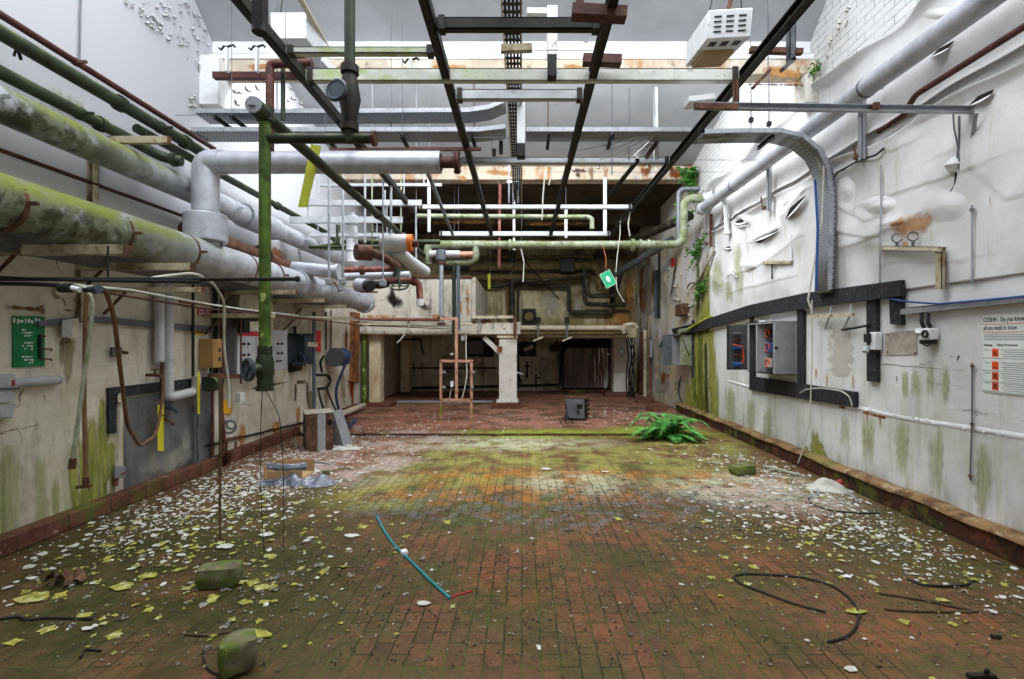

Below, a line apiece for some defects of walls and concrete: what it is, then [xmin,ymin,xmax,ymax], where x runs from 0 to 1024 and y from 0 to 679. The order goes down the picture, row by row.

rust [892,216,930,246]
leakage [651,255,719,417]
leakage [69,442,91,507]
leakage [99,399,116,491]